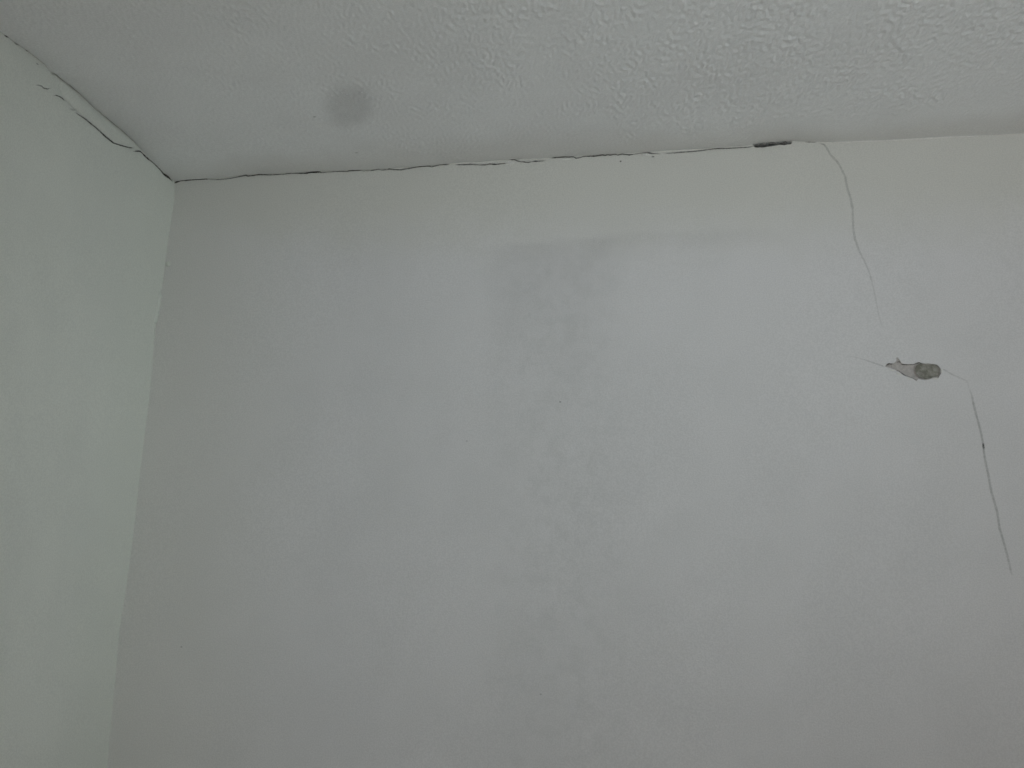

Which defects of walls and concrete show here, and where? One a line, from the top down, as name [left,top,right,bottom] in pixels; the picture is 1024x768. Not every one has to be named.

crack [40,85,748,183]
peeling [885,358,943,381]